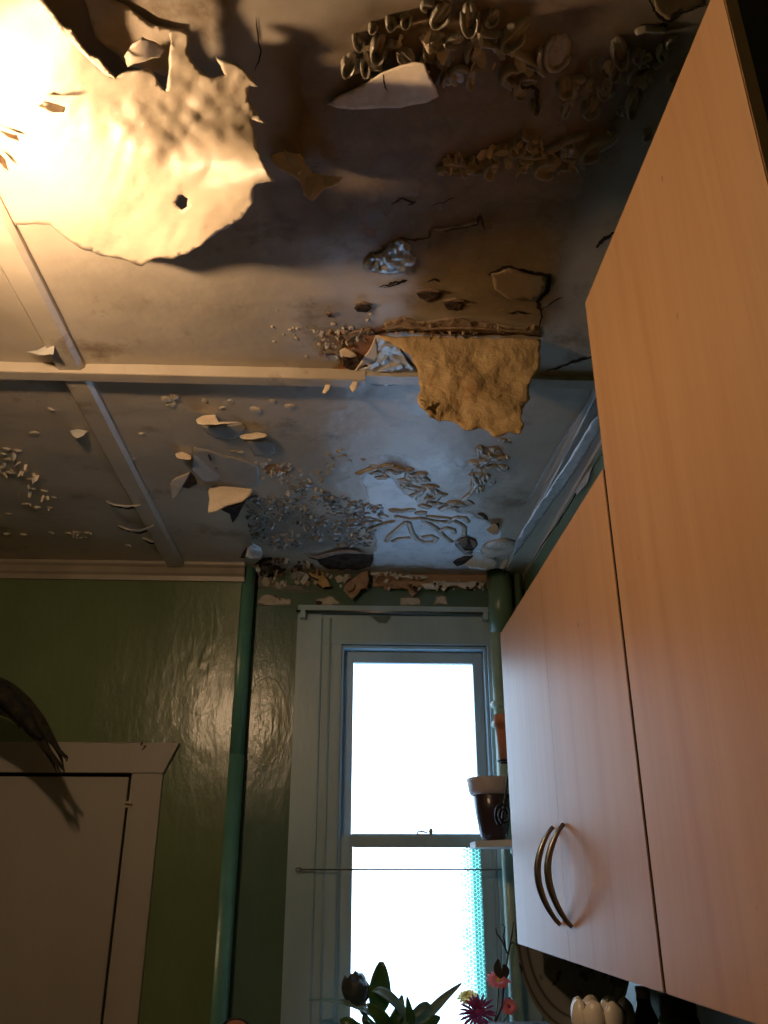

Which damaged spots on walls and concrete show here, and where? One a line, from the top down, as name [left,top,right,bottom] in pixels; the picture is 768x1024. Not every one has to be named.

peeling [327,29,451,110]
peeling [0,0,343,266]
crack [392,197,485,242]
peeling [318,288,543,493]
peeling [196,415,275,458]
peeling [170,452,252,522]
peeling [240,415,600,607]